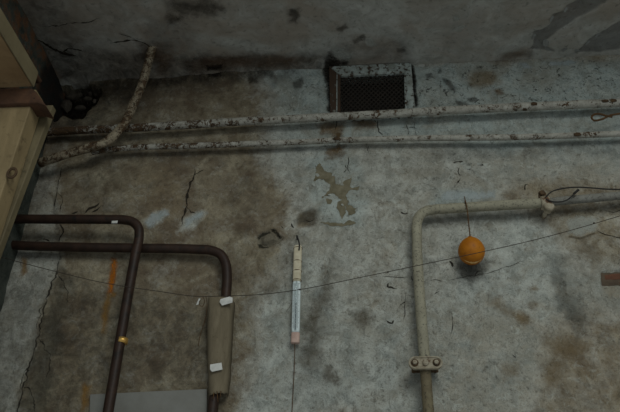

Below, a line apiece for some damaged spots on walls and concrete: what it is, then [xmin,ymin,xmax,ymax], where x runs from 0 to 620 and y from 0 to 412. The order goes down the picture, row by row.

crack [38,40,84,56]
crack [181,167,203,224]
peeling [306,163,360,227]
crack [17,225,69,412]